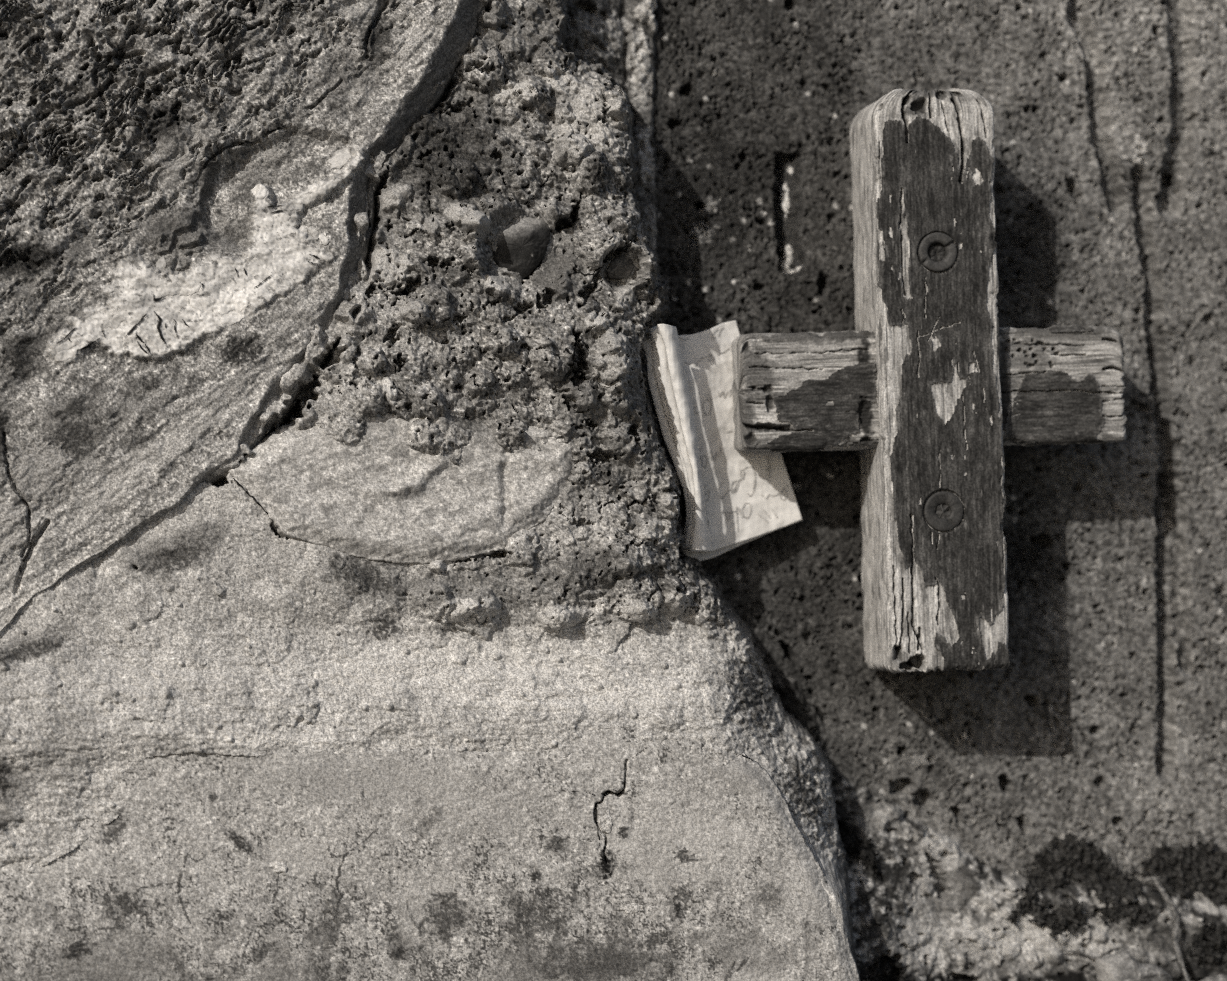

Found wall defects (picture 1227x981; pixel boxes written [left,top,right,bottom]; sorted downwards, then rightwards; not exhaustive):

crack [193,125,285,193]
crack [379,146,399,170]
leakage [1122,121,1163,176]
crack [233,478,277,527]
crack [572,748,646,849]